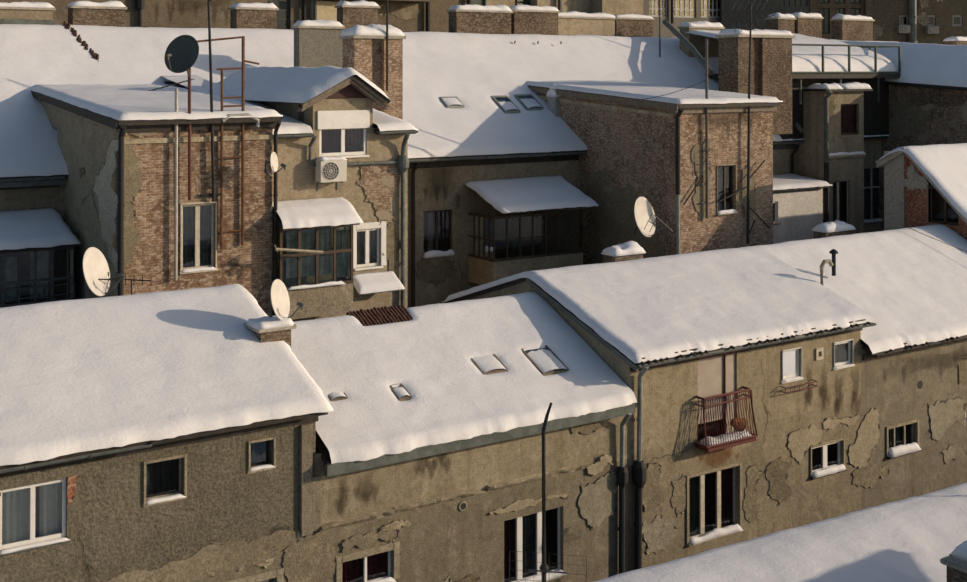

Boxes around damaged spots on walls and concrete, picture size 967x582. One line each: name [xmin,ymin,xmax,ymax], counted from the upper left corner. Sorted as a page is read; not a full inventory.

flaking render [79,132,143,274]
flaking render [357,164,401,272]
flaking render [67,475,77,505]
flaking render [489,455,617,528]
flaking render [765,407,880,506]
flaking render [928,396,966,464]
flaking render [106,530,301,582]